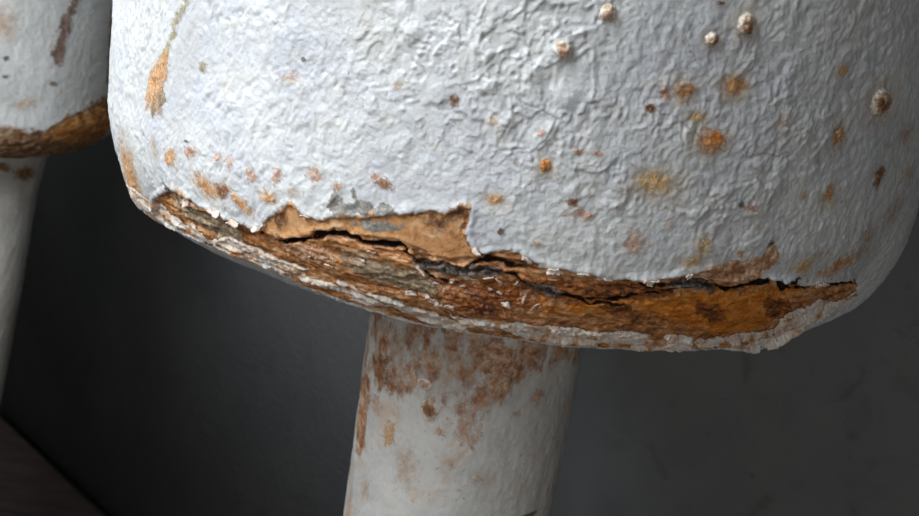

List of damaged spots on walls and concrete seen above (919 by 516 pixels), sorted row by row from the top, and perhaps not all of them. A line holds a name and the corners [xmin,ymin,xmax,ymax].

rust [50,0,79,66]
rust [145,0,188,116]
rust [0,97,110,181]
rust [119,137,143,196]
rust [162,146,196,170]
rust [192,168,255,218]
rust [257,168,280,205]
rust [371,174,395,190]
rust [567,199,593,220]
spalling [126,182,857,354]
crack [260,230,854,307]
rust [356,312,581,455]